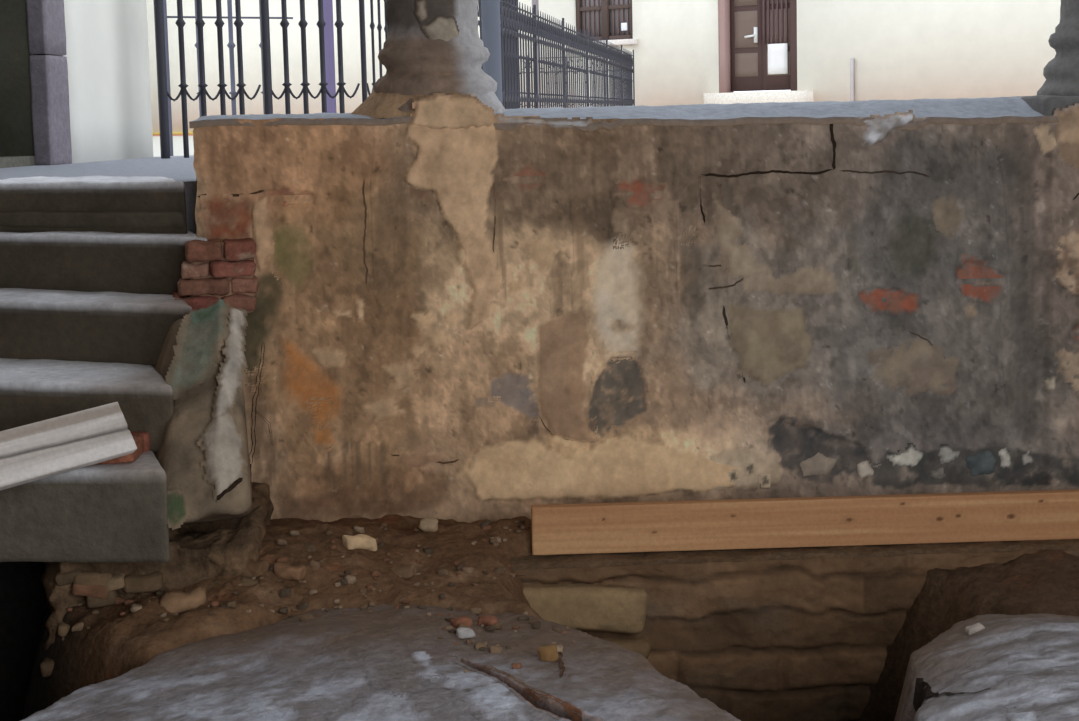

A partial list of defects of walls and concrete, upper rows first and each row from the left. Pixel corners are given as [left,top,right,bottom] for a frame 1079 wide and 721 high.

flaking render [414,0,459,42]
crack [699,124,930,222]
flaking render [1029,103,1079,172]
flaking render [360,93,593,425]
flaking render [1052,224,1079,299]
peeling [165,184,319,503]
flaking render [310,342,351,369]
crack [452,652,609,721]